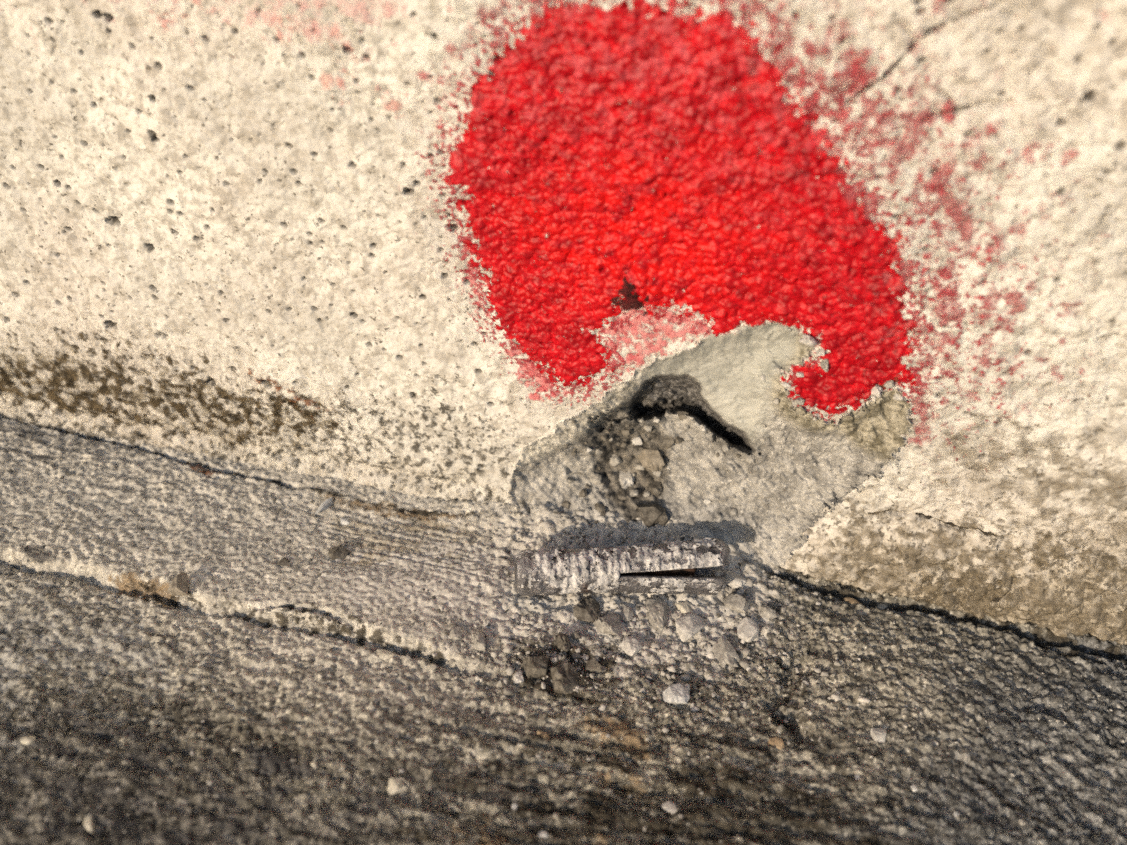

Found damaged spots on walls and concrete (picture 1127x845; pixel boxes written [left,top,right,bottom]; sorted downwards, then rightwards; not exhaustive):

crack [850,3,999,101]
crack [928,93,1010,118]
spalling [508,322,915,567]
crack [869,509,998,537]
crack [765,570,1127,664]